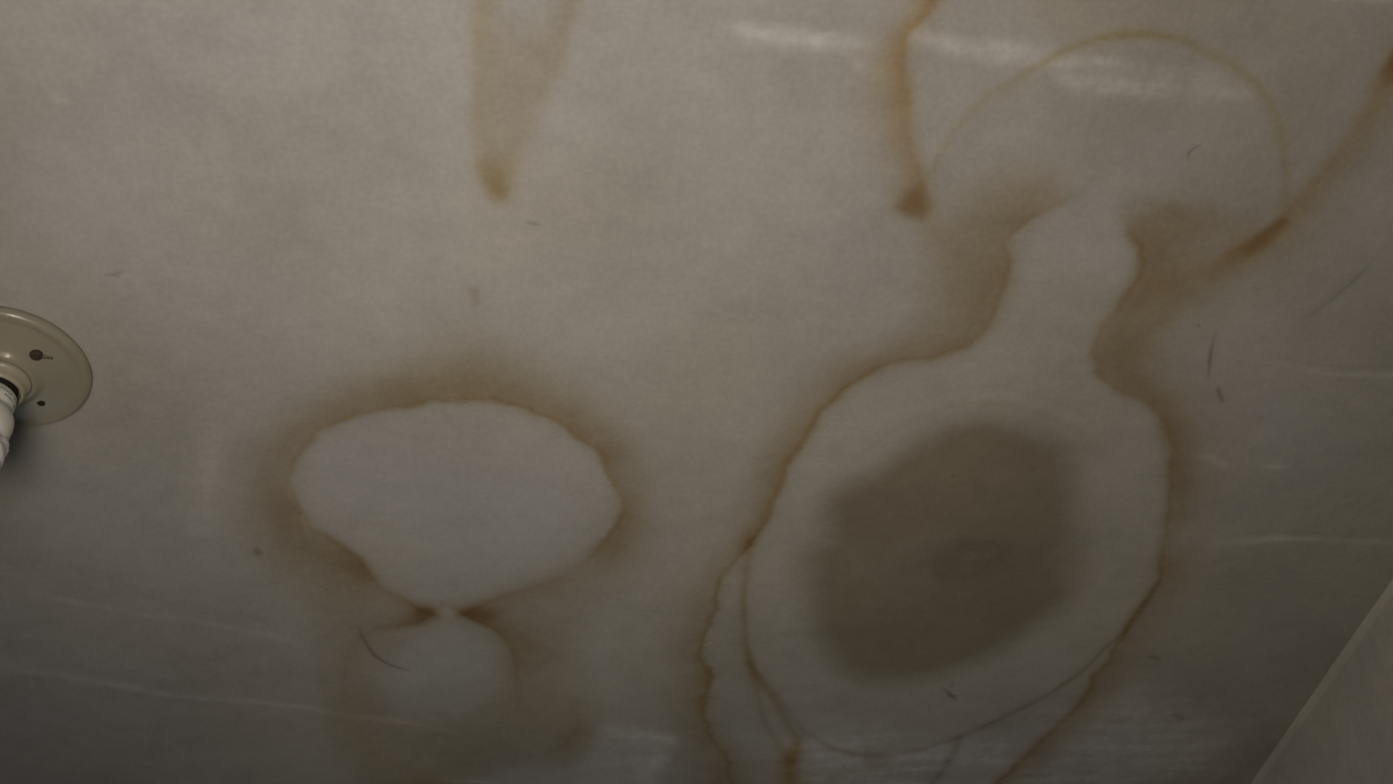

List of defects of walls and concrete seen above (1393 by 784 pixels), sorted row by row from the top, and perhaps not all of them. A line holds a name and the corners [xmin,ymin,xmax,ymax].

water stain [458,0,587,216]
water stain [176,316,671,784]
water stain [645,0,1366,784]